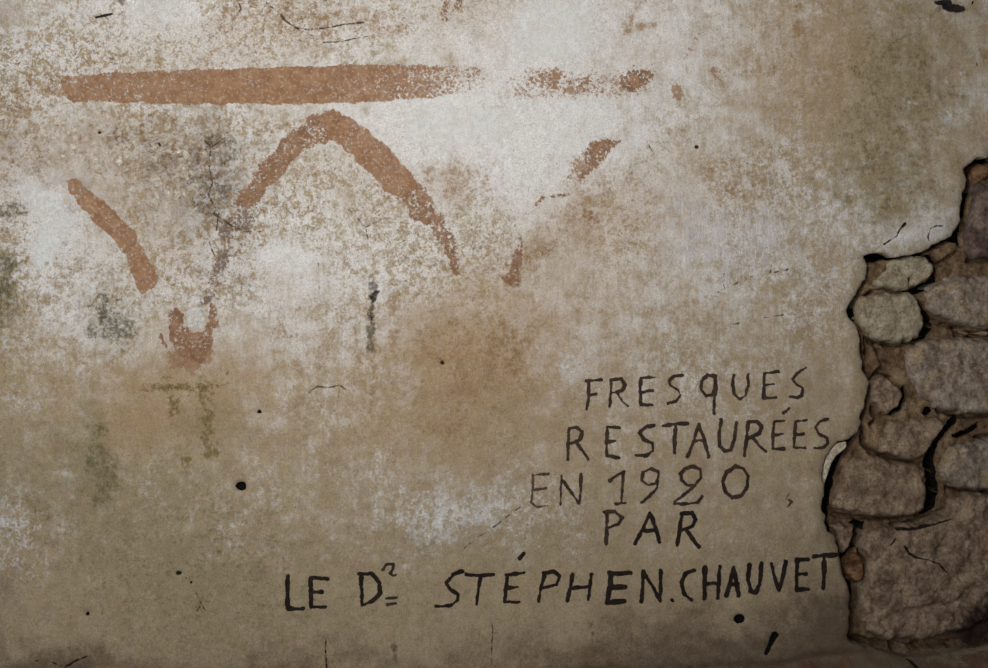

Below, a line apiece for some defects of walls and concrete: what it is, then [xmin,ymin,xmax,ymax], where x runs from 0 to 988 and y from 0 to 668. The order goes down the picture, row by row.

spalling [821,158,988,653]
crack [35,656,87,667]